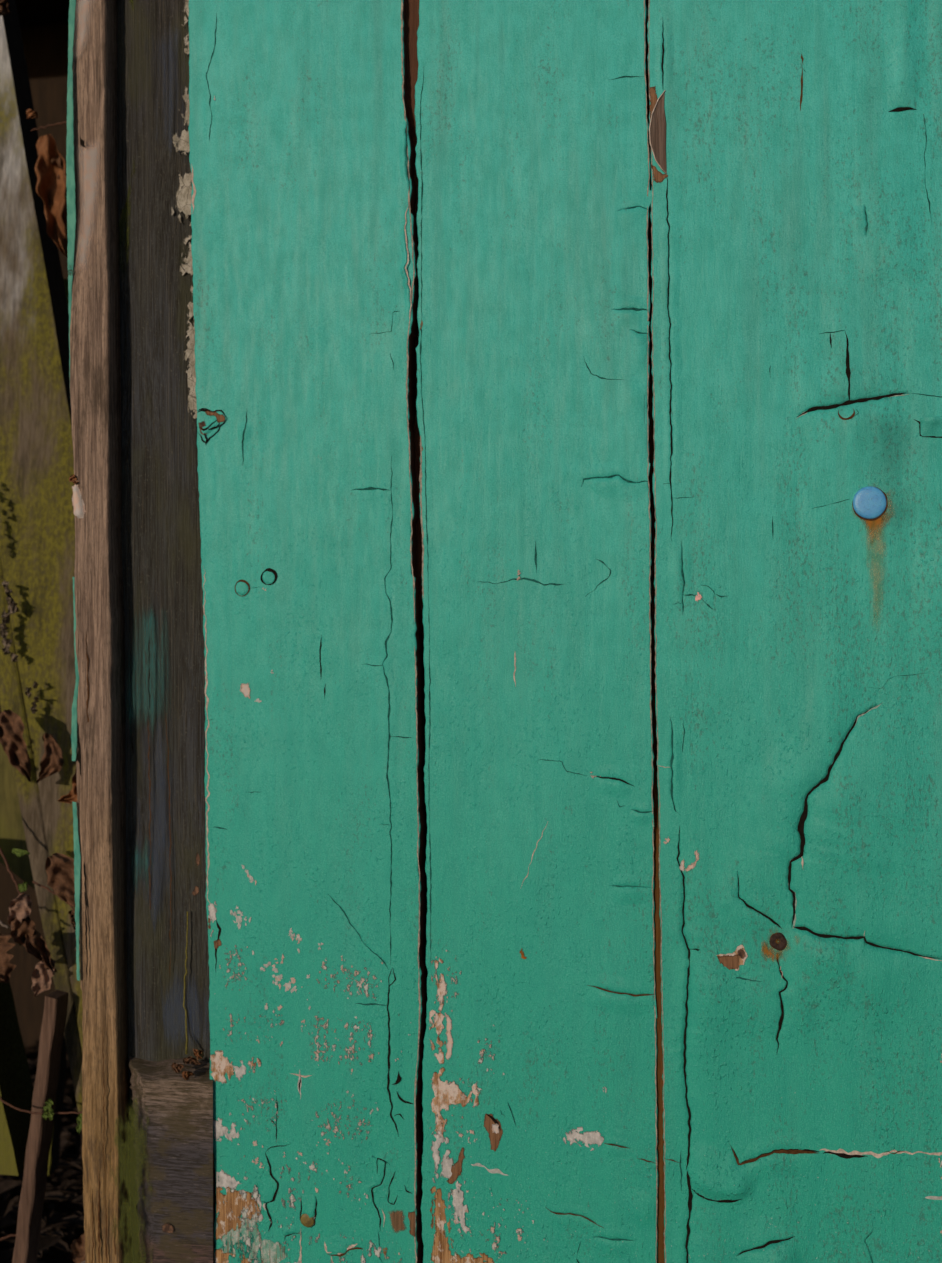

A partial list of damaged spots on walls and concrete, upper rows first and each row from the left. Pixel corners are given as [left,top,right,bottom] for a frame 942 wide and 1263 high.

peeling [181,0,189,55]
peeling [172,87,190,155]
peeling [649,87,658,119]
peeling [651,165,668,183]
peeling [170,173,208,435]
crack [769,330,942,469]
corrosion [852,487,888,543]
crack [540,671,942,1263]
peeling [429,950,534,1263]
peeling [331,1241,402,1263]
peeling [390,1211,415,1237]